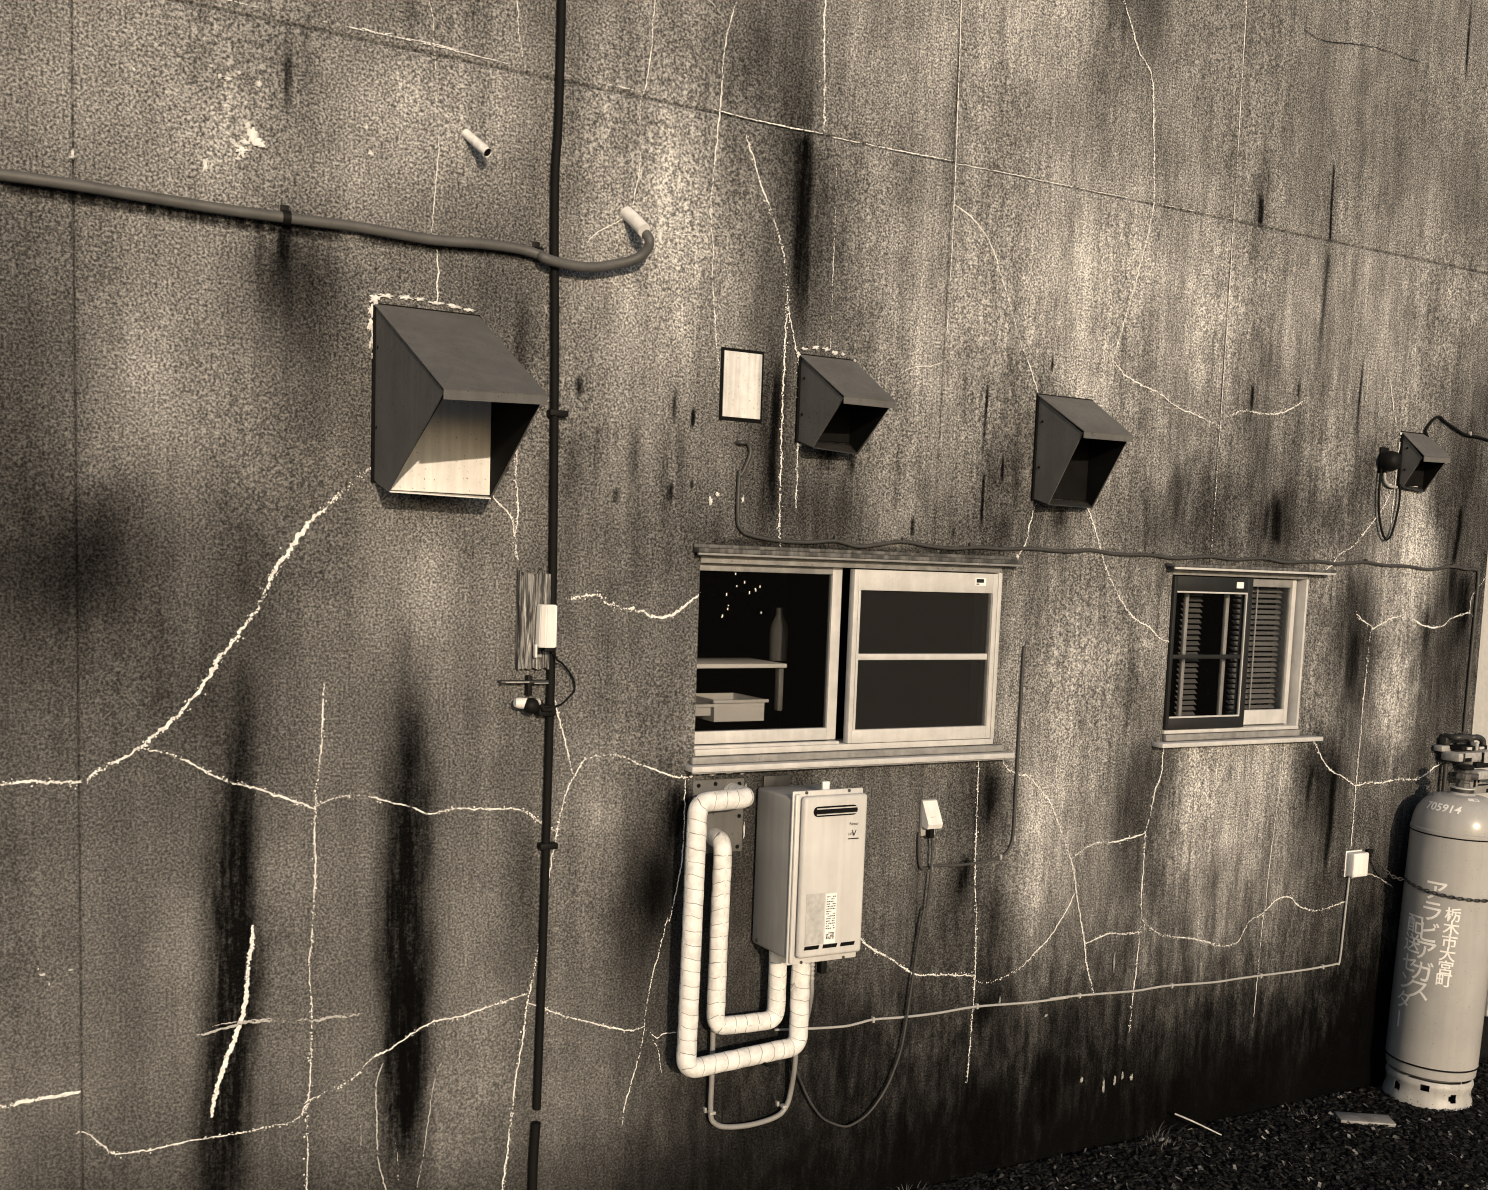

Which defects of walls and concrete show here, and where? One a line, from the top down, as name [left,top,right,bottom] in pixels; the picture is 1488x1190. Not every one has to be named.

leakage [768,375,781,501]
leakage [794,137,811,300]
crack [587,0,1308,552]
leakage [198,720,261,1190]
crack [0,451,699,1190]
leakage [377,721,432,1166]
crack [861,364,1484,1083]